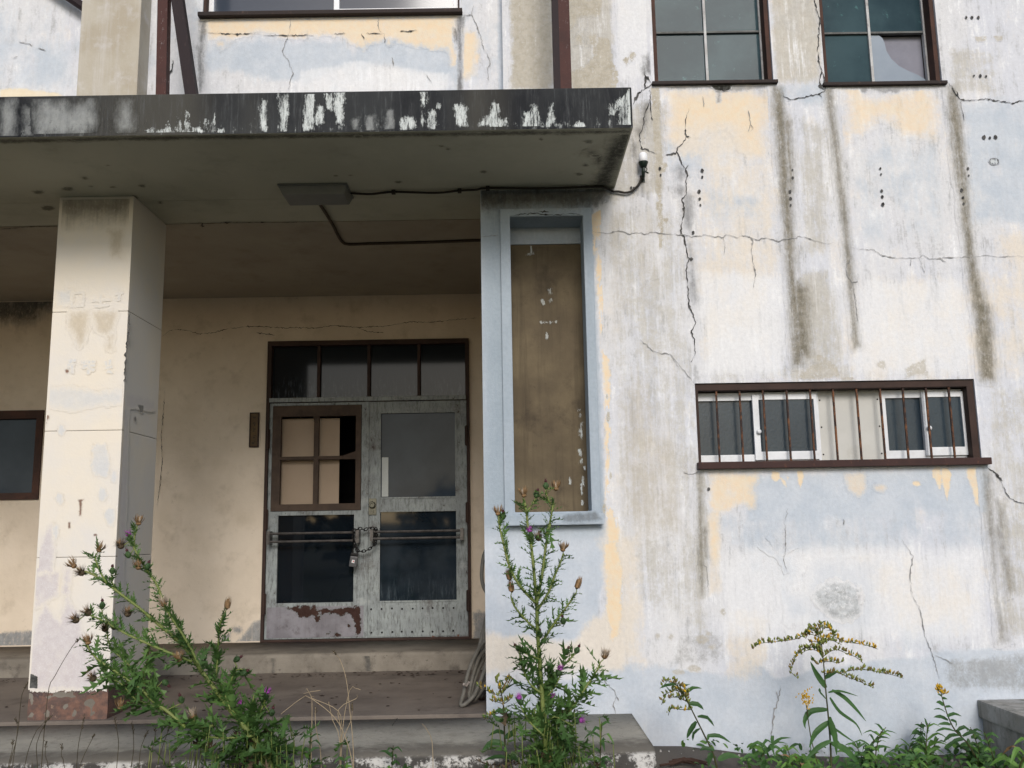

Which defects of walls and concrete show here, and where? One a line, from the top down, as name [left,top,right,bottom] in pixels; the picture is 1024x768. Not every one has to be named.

crack [221,20,414,89]
peeling [207,18,482,78]
crack [783,0,826,100]
peeling [0,87,64,97]
water stain [666,82,817,373]
crack [598,71,1022,378]
water stain [820,81,1003,387]
peeling [842,469,888,499]
peeling [912,466,952,502]
peeling [965,466,980,507]
corrosion [285,605,362,637]
crack [902,540,951,672]